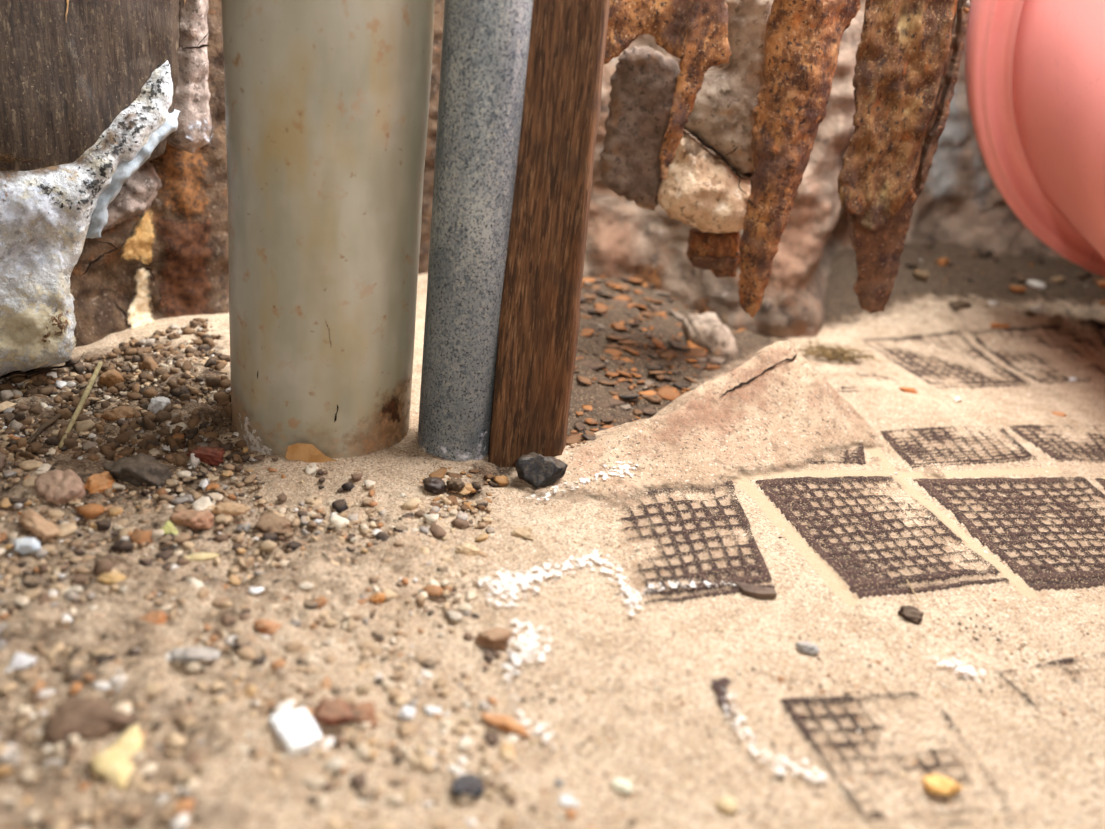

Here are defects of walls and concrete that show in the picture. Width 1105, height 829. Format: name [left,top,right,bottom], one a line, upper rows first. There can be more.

corrosion [693,297,728,325]
crack [718,354,797,399]
corrosion [353,397,410,451]
efflorescence [477,550,736,751]